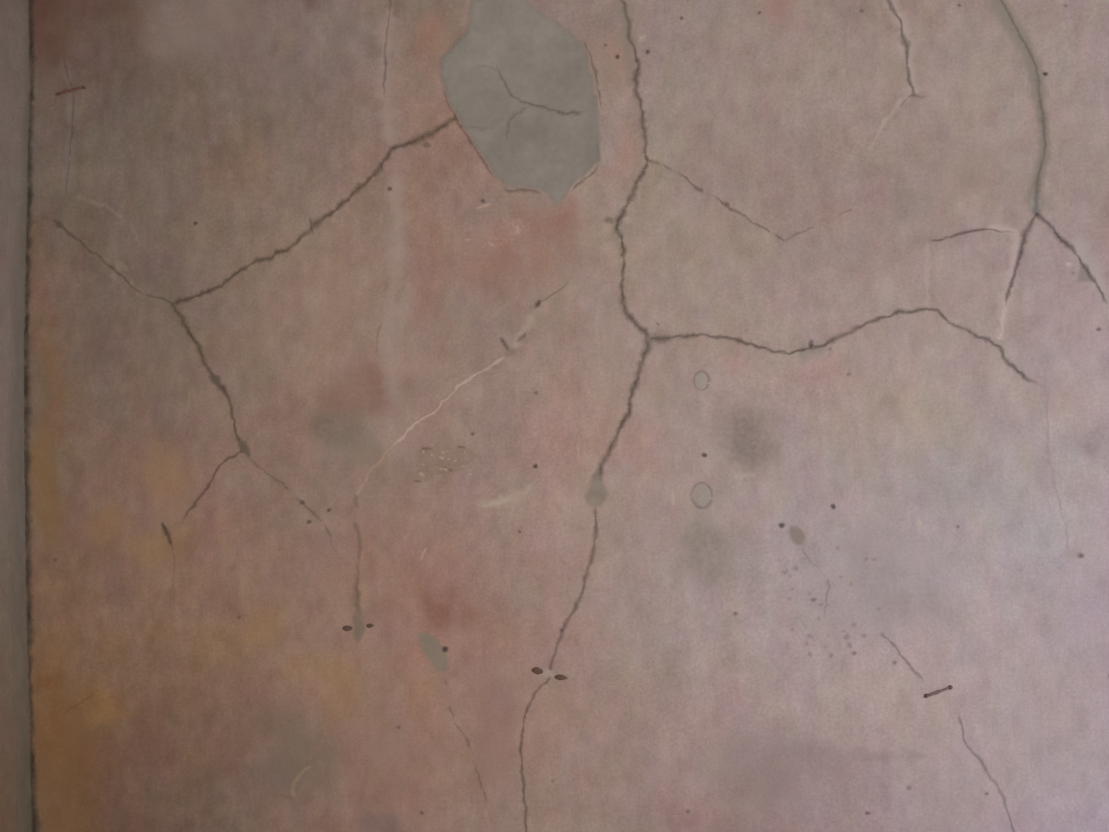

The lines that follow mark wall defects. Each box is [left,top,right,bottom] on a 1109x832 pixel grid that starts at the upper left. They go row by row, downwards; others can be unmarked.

crack [24,0,572,832]
crack [497,65,589,139]
crack [517,0,1109,832]